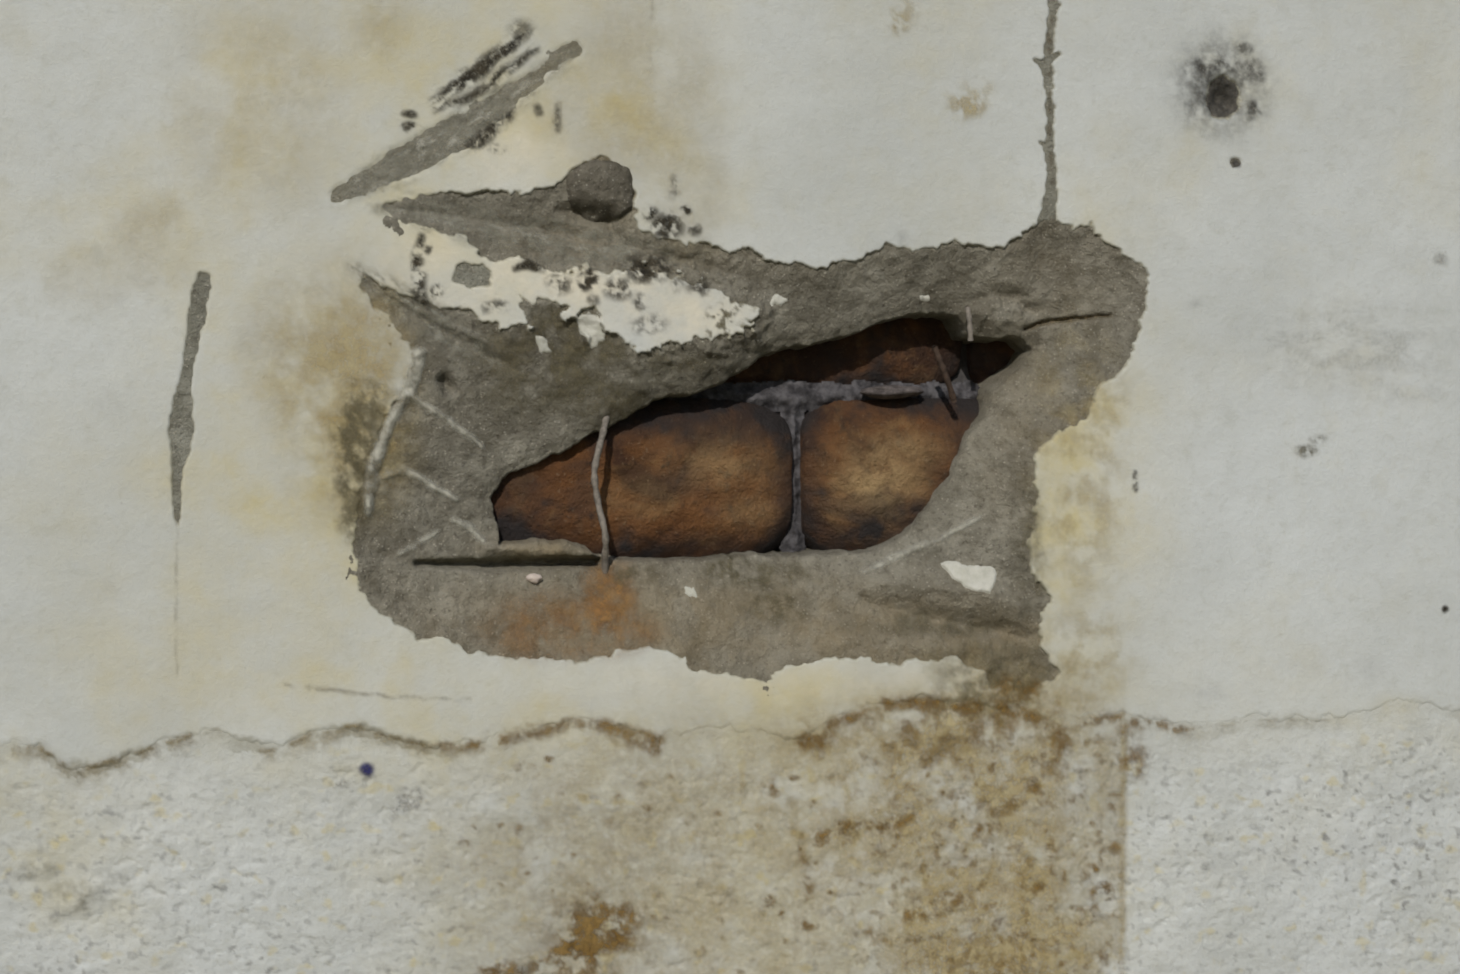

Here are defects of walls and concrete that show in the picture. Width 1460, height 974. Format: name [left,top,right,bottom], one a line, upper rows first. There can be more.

crack [1034,0,1061,225]
spalling [1206,76,1238,117]
flaking render [330,41,1147,696]
crack [41,735,190,773]
crack [291,724,426,747]
damp [808,679,1093,974]
corrosion [482,903,636,974]